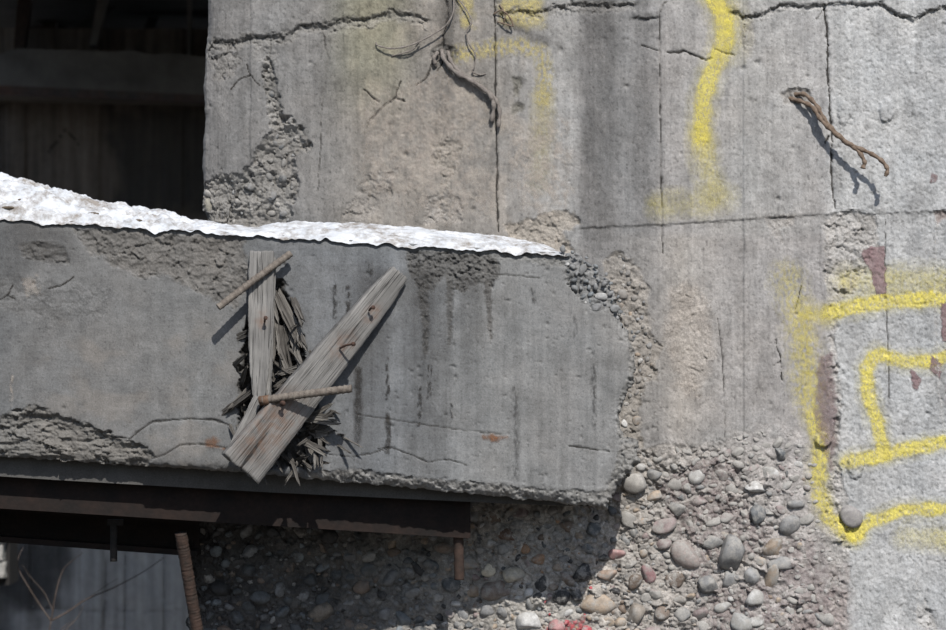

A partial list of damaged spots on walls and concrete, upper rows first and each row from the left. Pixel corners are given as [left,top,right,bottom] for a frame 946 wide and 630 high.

spalling [73,6,429,310]
crack [823,8,835,206]
spalling [0,403,239,472]
crack [115,418,224,438]
spalling [186,209,887,630]